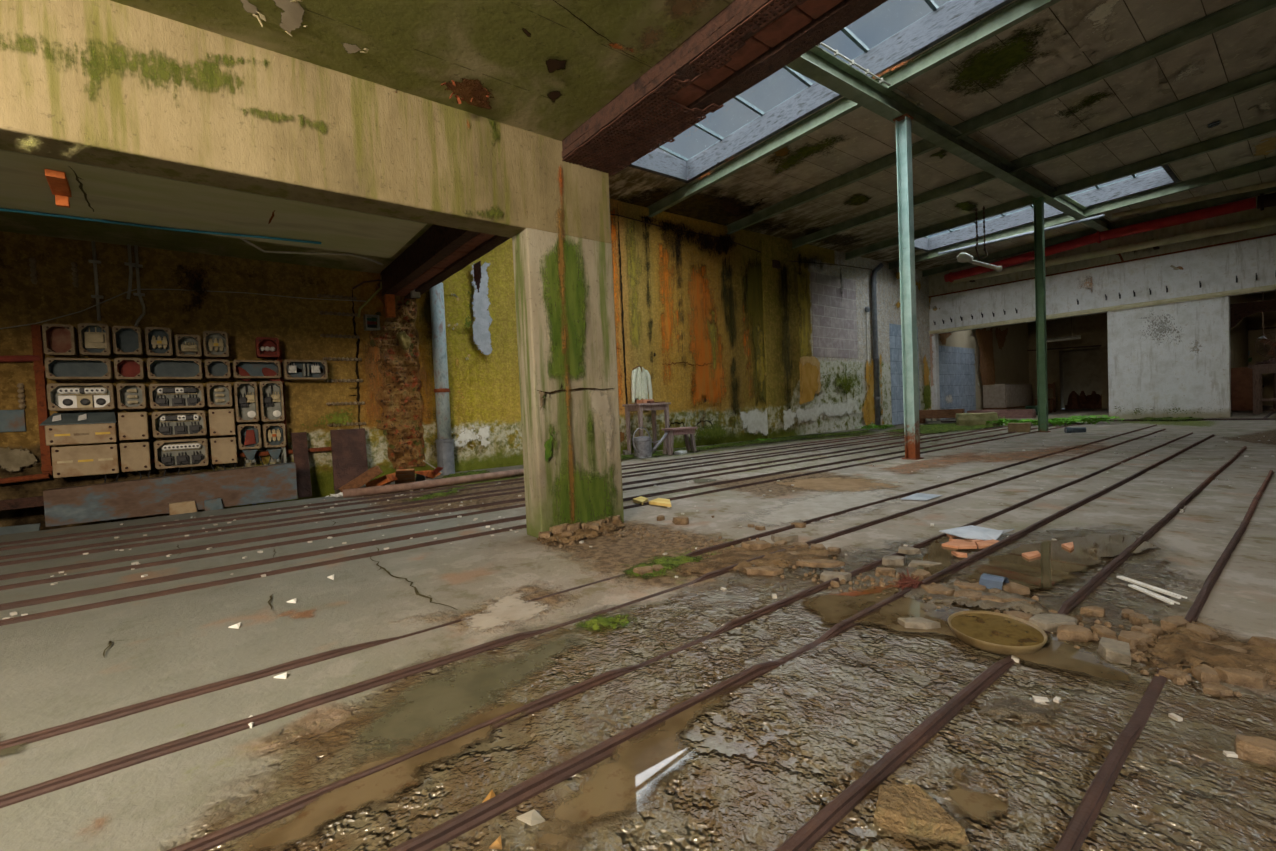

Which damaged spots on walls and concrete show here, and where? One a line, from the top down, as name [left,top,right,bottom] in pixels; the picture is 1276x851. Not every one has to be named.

leakage [82,54,104,100]
leakage [618,187,786,414]
leakage [795,253,823,357]
spalling [369,281,426,469]
leakage [544,209,583,522]
peeling [740,409,768,436]
peeling [783,356,859,431]
crack [370,547,457,610]